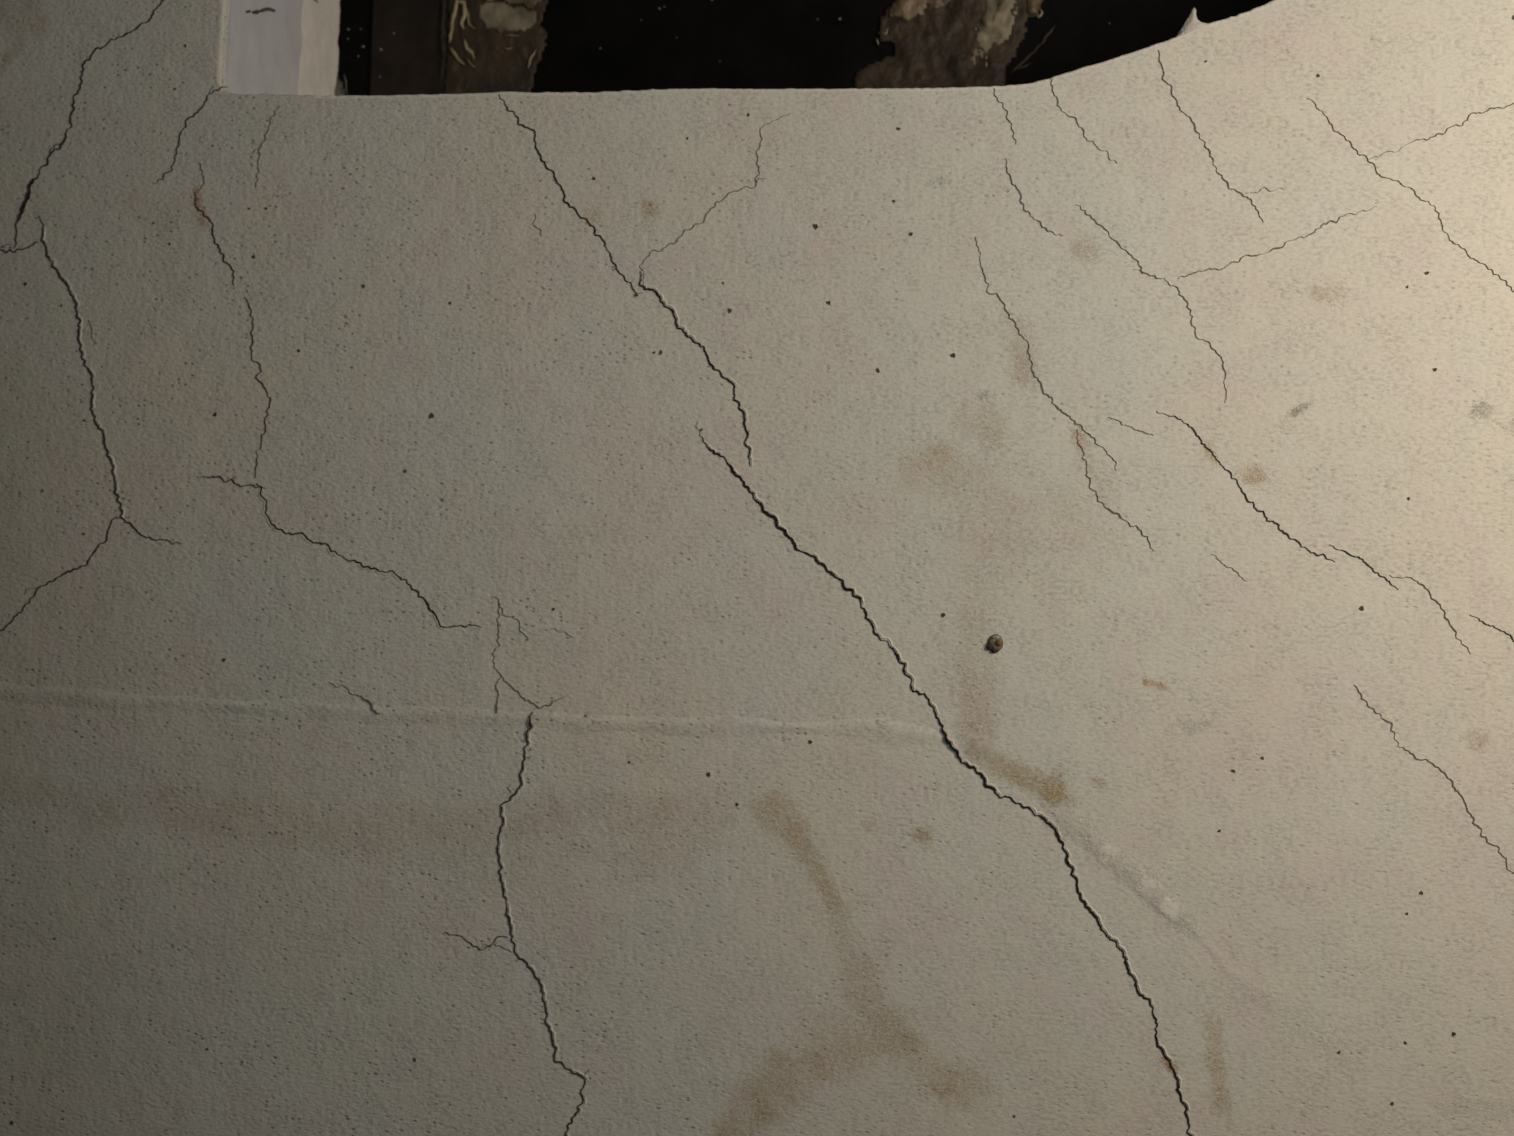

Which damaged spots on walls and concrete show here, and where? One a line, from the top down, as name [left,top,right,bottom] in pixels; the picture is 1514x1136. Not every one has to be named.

crack [0,0,181,631]
crack [157,86,589,1136]
leakage [0,764,997,1136]
crack [499,94,1197,1136]
crack [975,237,1514,654]
crack [994,52,1514,401]
crack [1356,687,1512,872]